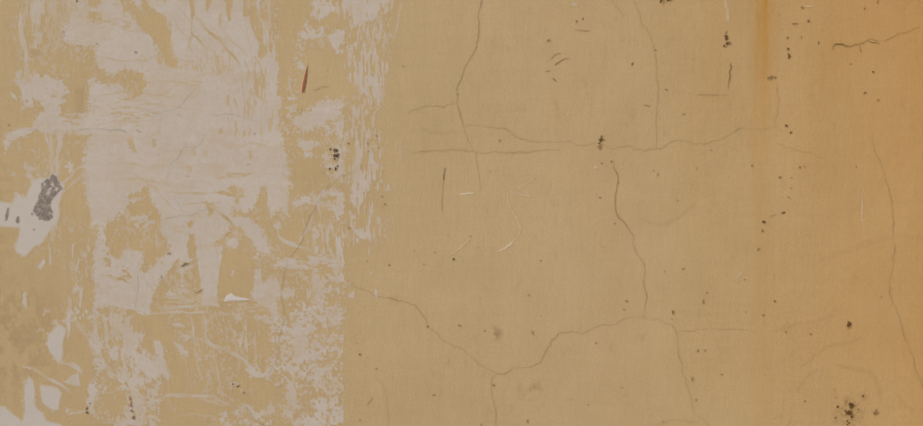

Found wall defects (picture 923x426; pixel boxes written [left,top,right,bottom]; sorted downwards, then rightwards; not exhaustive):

peeling [0,0,408,426]
crack [347,0,825,426]
crack [832,27,921,52]